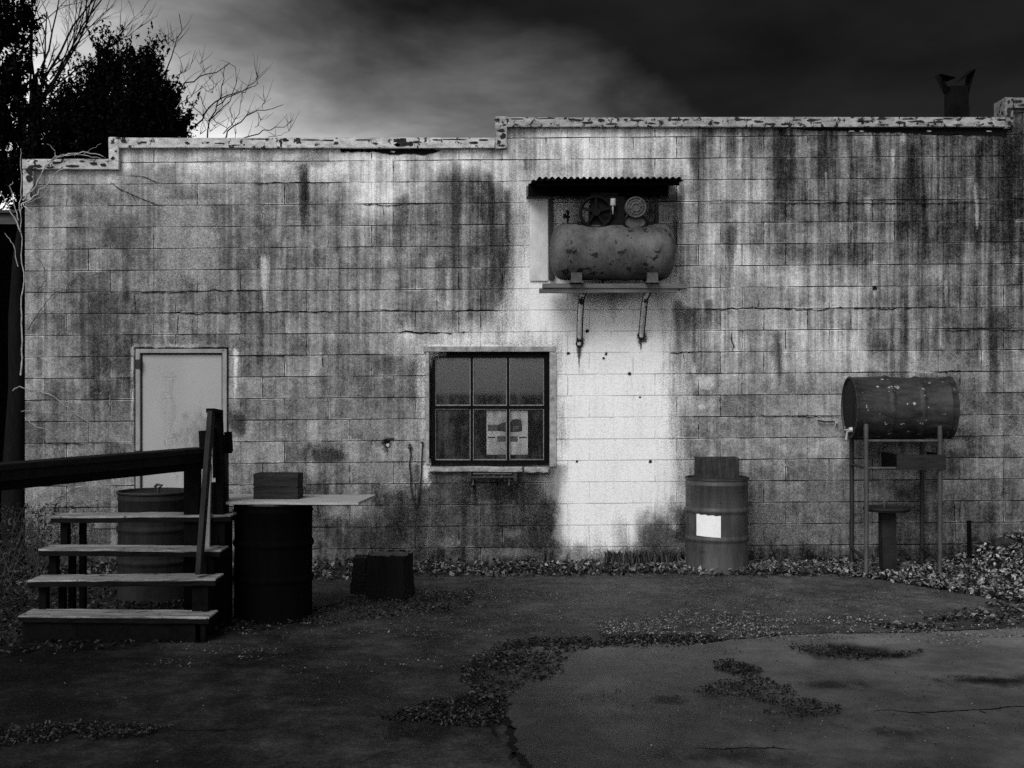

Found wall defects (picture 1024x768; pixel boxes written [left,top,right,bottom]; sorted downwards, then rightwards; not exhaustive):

spalling [394,138,420,147]
spalling [433,118,522,147]
peeling [848,117,963,132]
damp [287,155,327,228]
damp [841,150,850,217]
damp [891,133,919,227]
damp [973,144,983,227]
damp [482,175,509,285]
efflorescence [260,237,304,308]
damp [383,271,398,344]
damp [426,255,436,308]
crack [480,700,533,768]